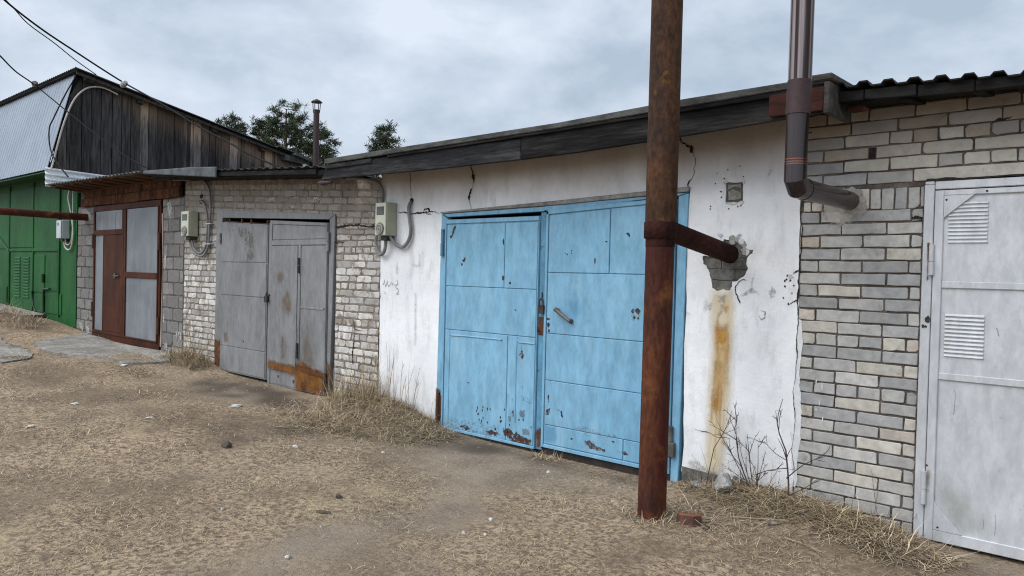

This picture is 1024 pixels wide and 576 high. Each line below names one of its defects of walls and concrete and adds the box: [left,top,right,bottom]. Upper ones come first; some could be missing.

crack [679,138,696,187]
flaking render [703,234,753,291]
crack [789,200,803,466]
corrosion [267,341,330,396]
corrosion [708,294,731,475]